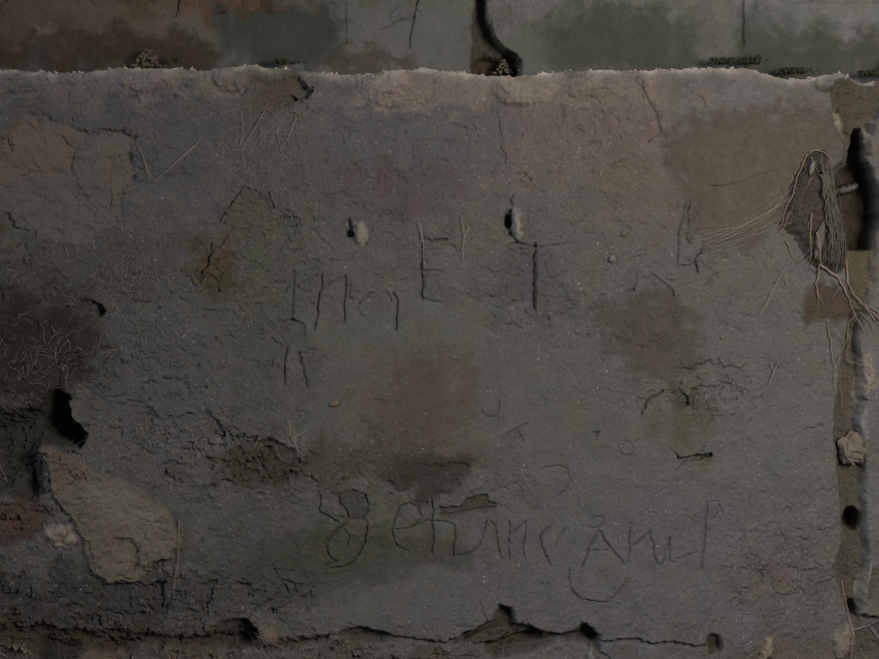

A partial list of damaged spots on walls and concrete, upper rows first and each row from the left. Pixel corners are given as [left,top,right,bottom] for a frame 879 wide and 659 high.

peeling [0,385,183,585]